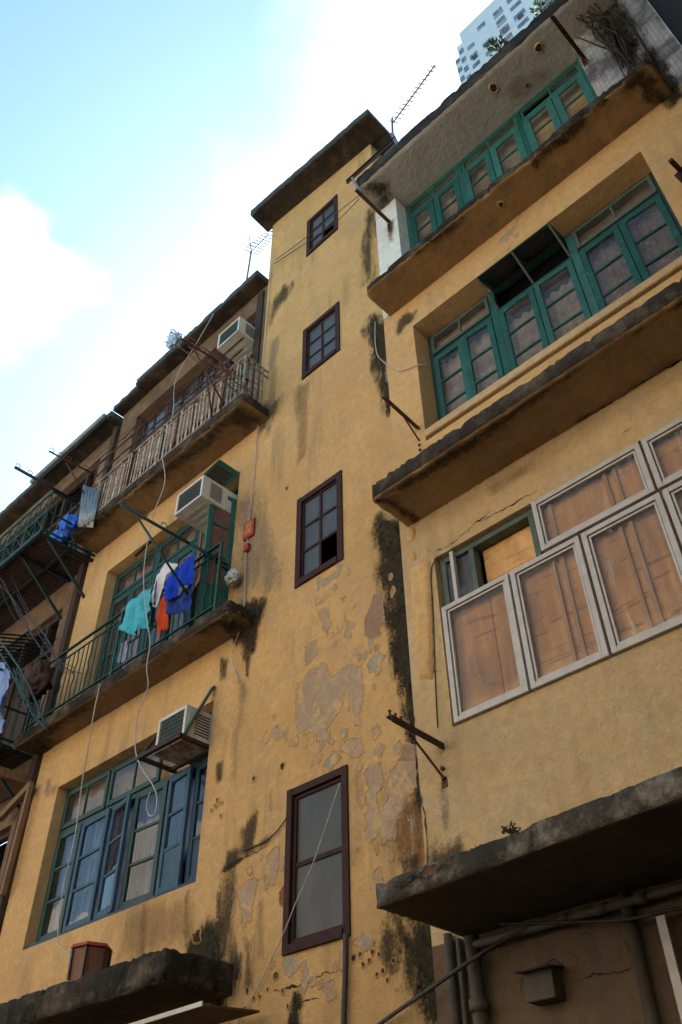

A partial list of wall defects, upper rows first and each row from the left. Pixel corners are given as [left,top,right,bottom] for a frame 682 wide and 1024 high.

damp [531,98,607,169]
damp [361,181,391,279]
damp [361,311,416,416]
crack [429,490,537,562]
damp [197,597,267,676]
damp [372,366,582,813]
peeling [262,562,458,890]
damp [187,811,268,1006]